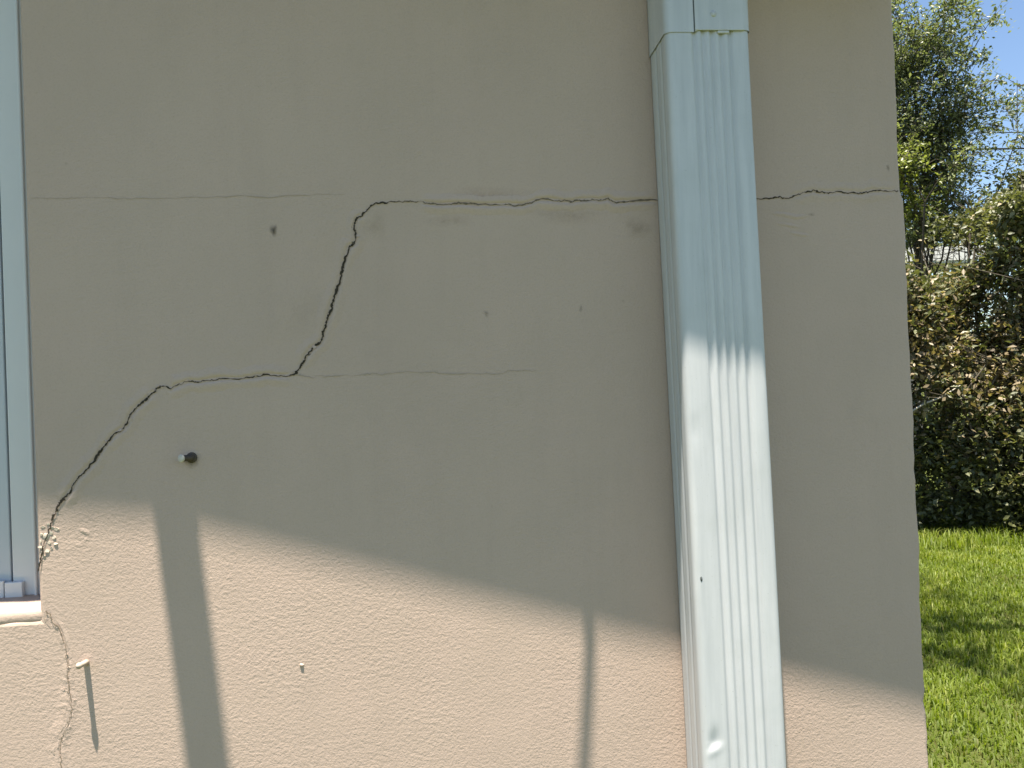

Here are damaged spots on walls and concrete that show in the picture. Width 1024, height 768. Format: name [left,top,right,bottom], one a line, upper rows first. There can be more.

crack [756,190,898,199]
crack [38,198,658,571]
crack [43,611,79,768]